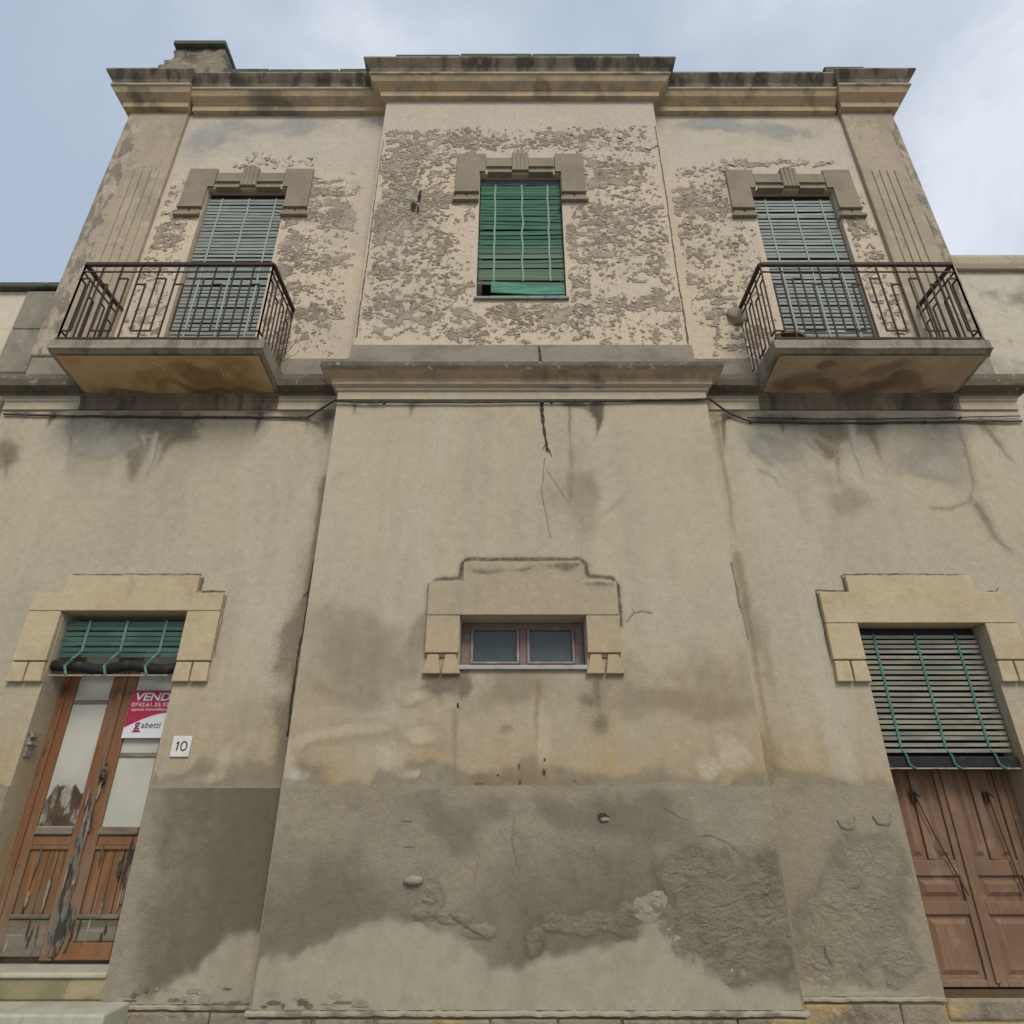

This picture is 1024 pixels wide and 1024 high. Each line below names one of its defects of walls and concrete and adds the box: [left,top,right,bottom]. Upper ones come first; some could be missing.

peeling [121,174,194,337]
peeling [233,151,360,357]
peeling [359,123,834,357]
peeling [843,212,911,335]
damp [0,411,209,487]
crack [540,403,563,537]
damp [718,411,1017,559]
damp [151,471,699,788]
spalling [406,880,502,941]
damp [112,906,942,1010]
spalling [633,890,667,923]